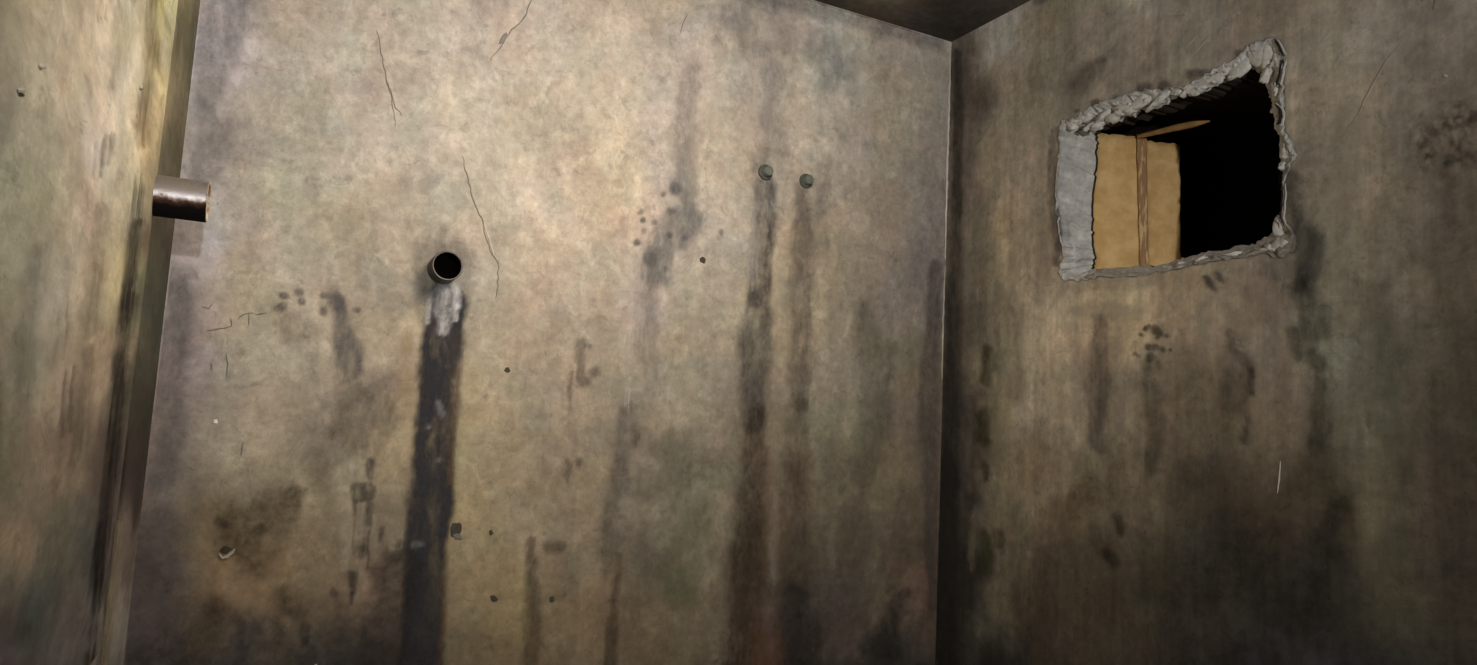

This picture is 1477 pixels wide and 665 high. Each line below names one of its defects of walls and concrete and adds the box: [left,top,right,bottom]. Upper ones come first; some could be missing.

spalling [1055,37,1299,282]
damp [399,283,466,665]